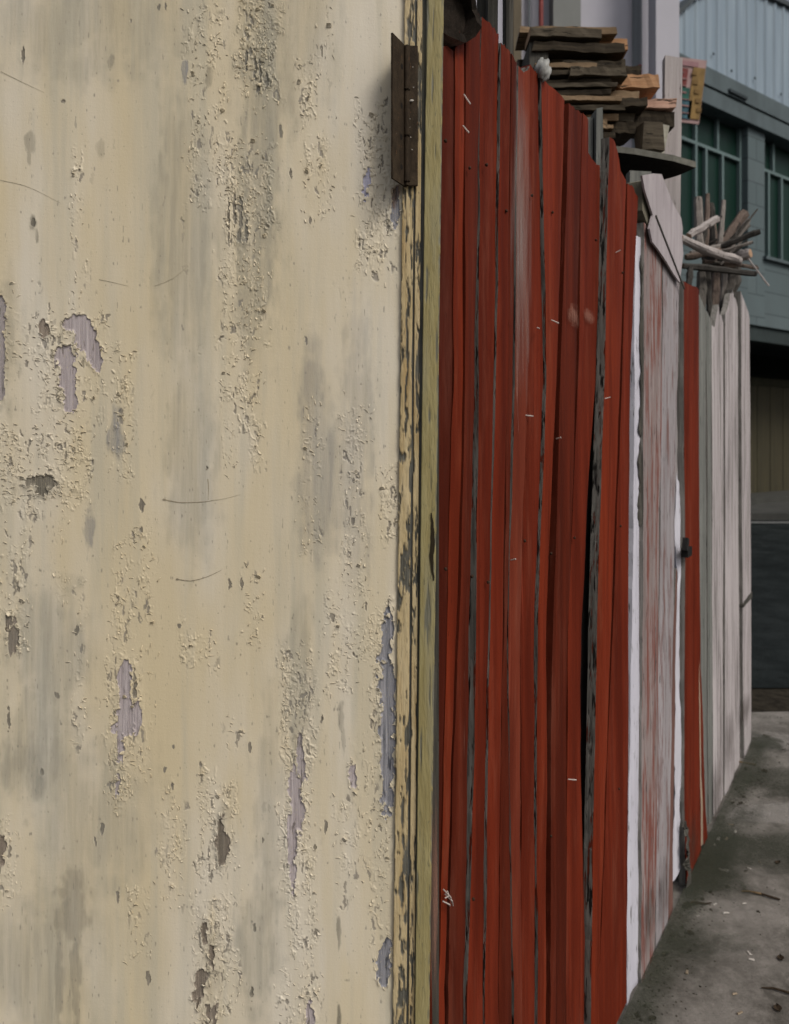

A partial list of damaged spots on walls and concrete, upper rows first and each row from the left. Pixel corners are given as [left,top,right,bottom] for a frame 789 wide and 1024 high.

peeling [0,270,147,663]
peeling [54,525,256,1024]
peeling [228,561,265,648]
peeling [157,0,339,477]
peeling [274,389,399,1024]
peeling [350,96,402,288]